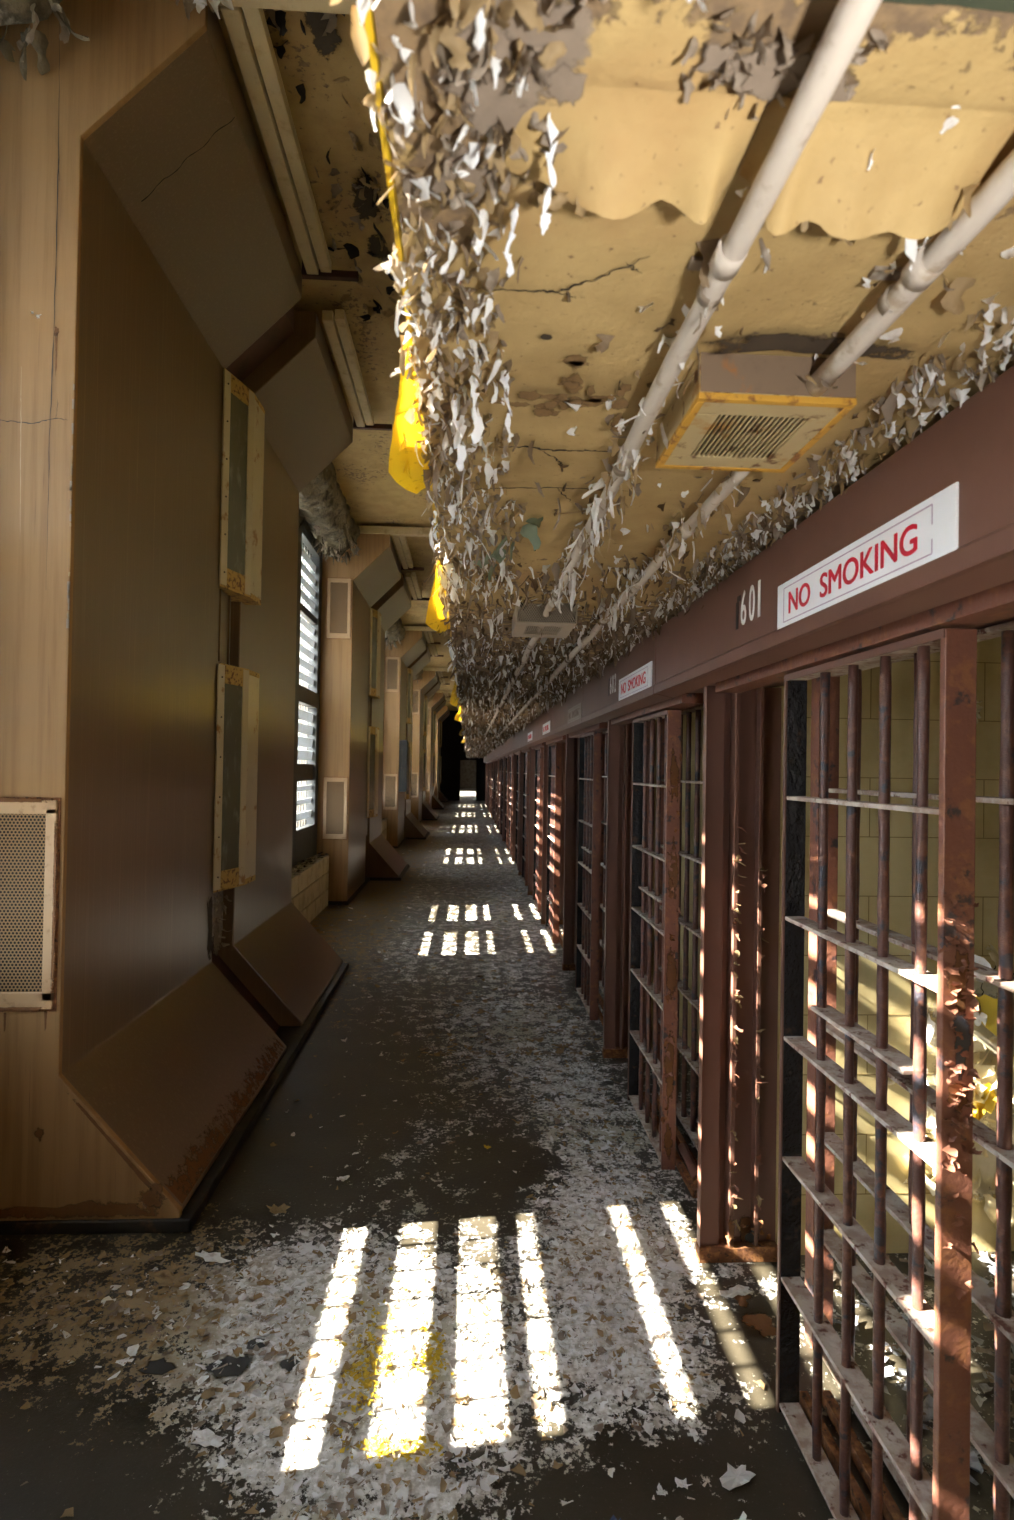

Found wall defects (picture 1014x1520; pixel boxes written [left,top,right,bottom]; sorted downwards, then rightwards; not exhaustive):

peeling [176,0,234,20]
crack [461,256,650,298]
peeling [266,0,1014,758]